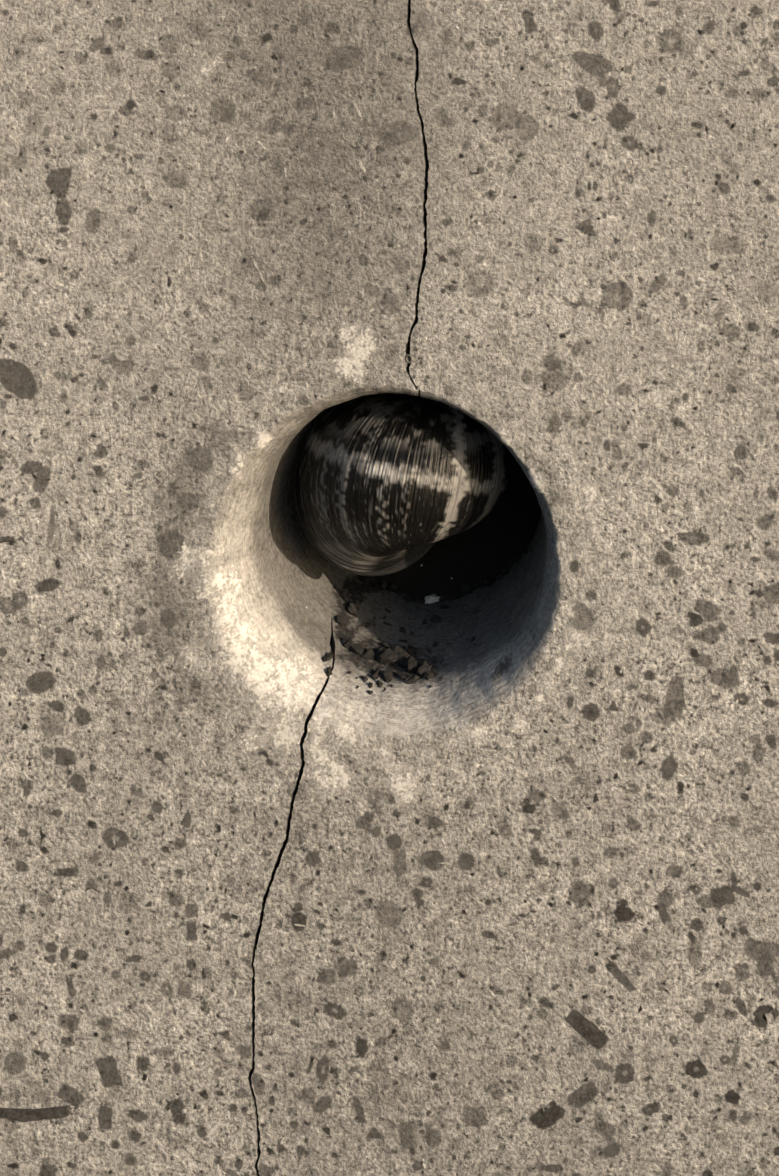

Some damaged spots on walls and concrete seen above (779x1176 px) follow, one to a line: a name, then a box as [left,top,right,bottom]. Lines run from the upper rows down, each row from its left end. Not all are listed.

crack [405,0,429,396]
crack [248,613,335,1176]